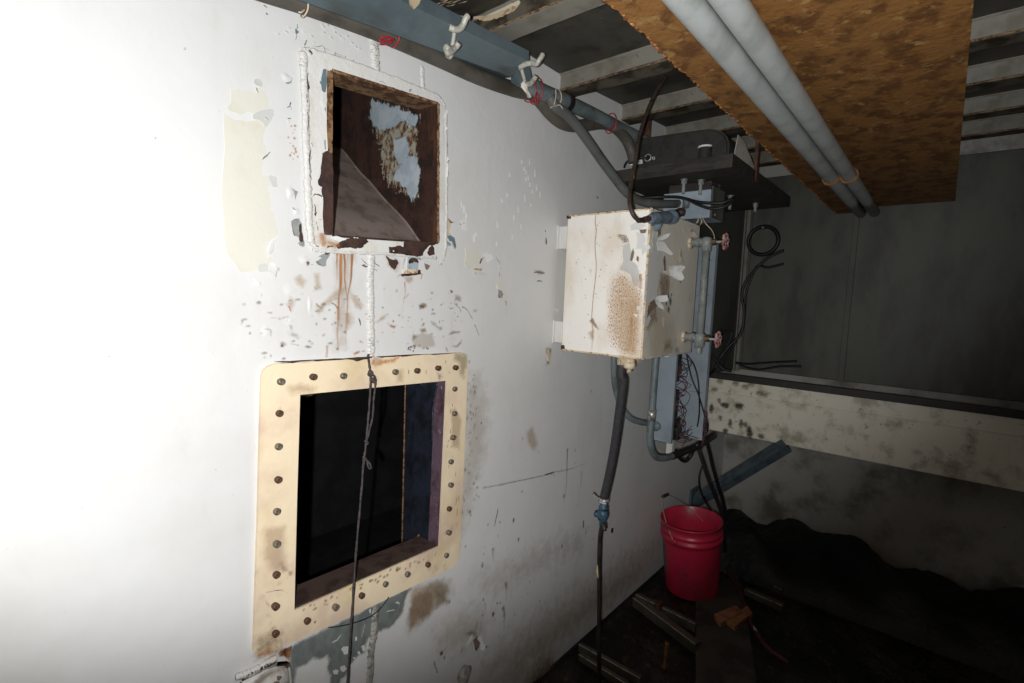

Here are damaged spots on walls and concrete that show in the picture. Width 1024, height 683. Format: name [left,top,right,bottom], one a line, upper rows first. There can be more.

peeling [222,78,280,286]
corrosion [318,69,440,309]
peeling [316,252,330,267]
peeling [439,201,507,305]
damp [706,399,763,438]
peeling [291,589,410,683]